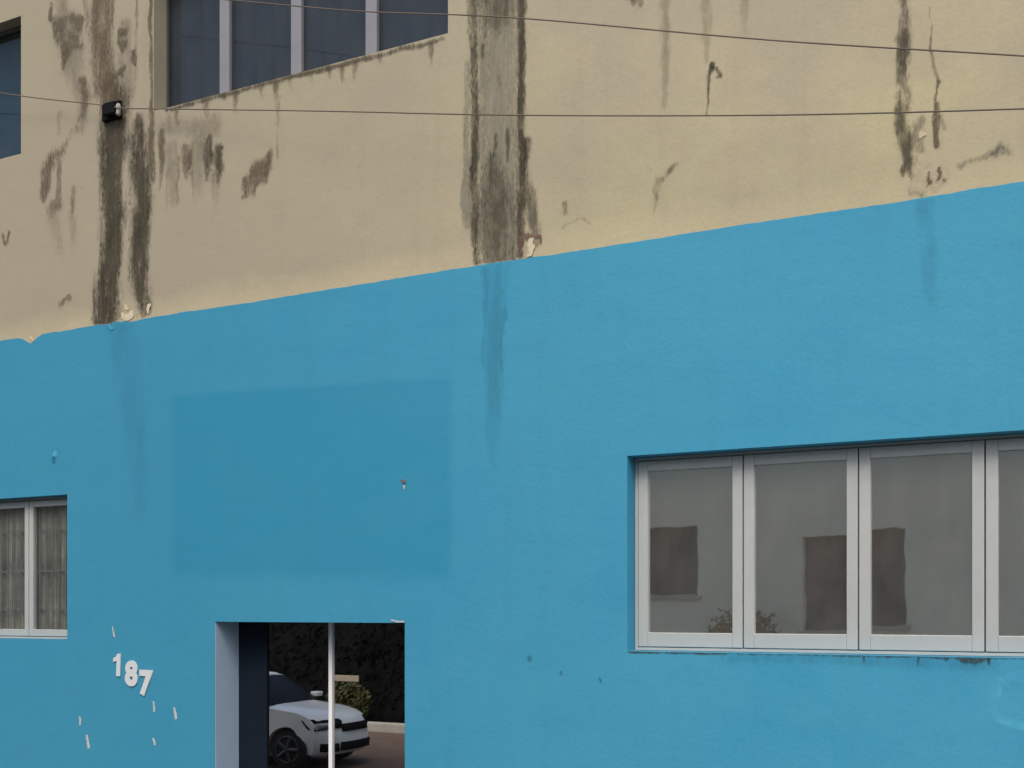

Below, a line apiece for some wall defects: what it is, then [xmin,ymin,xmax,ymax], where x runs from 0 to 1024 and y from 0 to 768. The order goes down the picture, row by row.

damp [166,40,437,111]
damp [895,0,923,177]
damp [41,149,63,208]
damp [91,0,164,324]
damp [182,133,223,181]
damp [243,152,272,196]
damp [461,0,537,265]
peeling [517,234,542,258]
peeling [108,303,134,330]